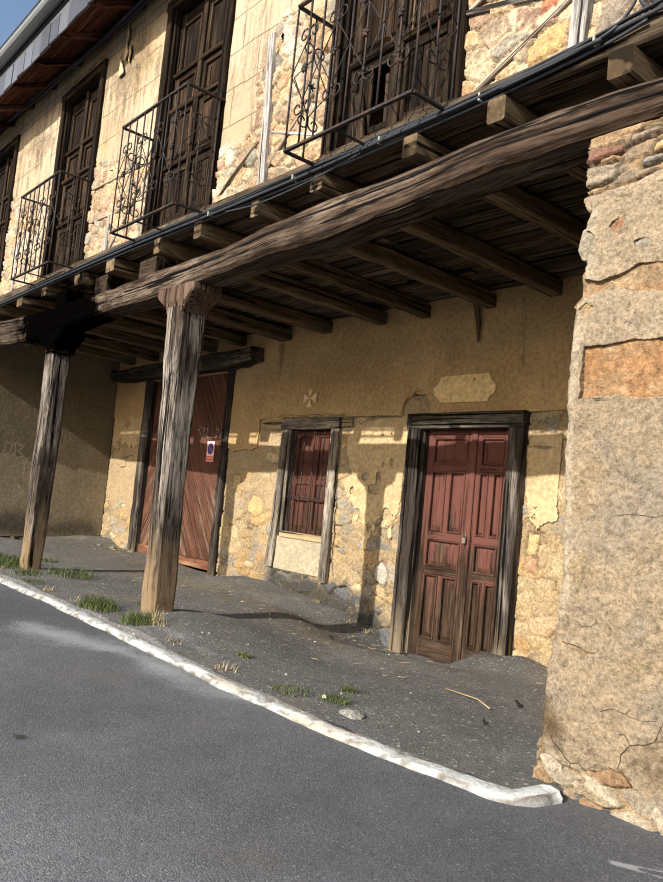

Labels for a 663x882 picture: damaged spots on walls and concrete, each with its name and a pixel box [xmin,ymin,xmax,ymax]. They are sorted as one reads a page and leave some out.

spalling [461,0,572,97]
spalling [587,0,652,39]
spalling [212,0,336,204]
spalling [84,151,151,259]
peeling [343,417,408,551]
crack [550,735,585,771]
crack [600,708,663,769]